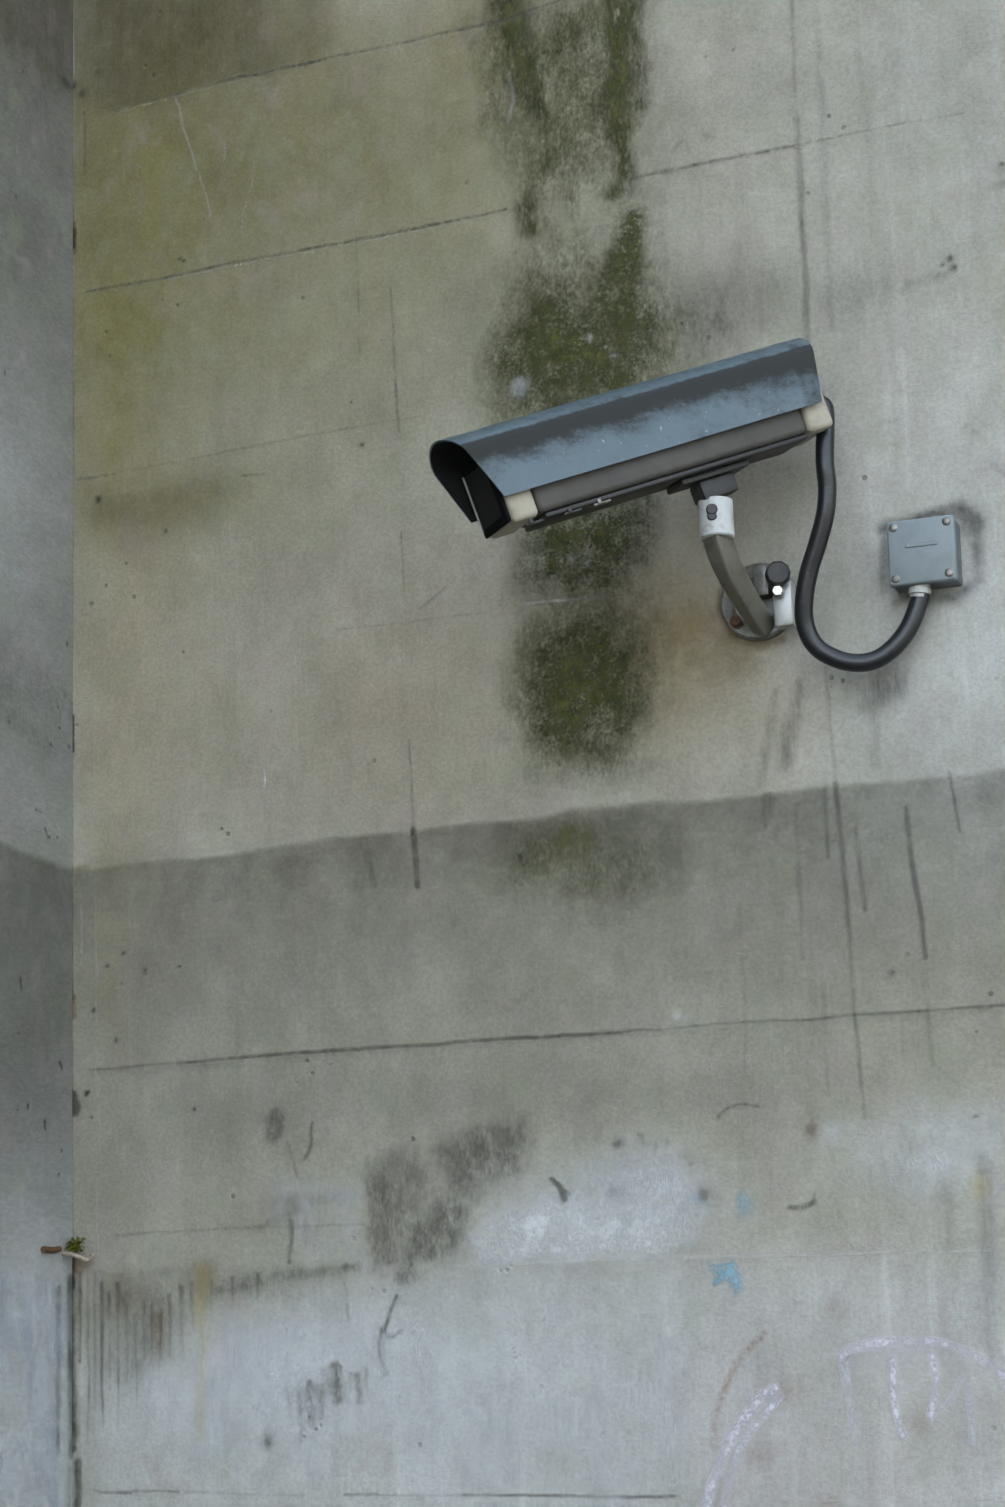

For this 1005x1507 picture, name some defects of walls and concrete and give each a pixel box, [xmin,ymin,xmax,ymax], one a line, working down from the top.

leakage [489,0,642,198]
leakage [519,195,536,235]